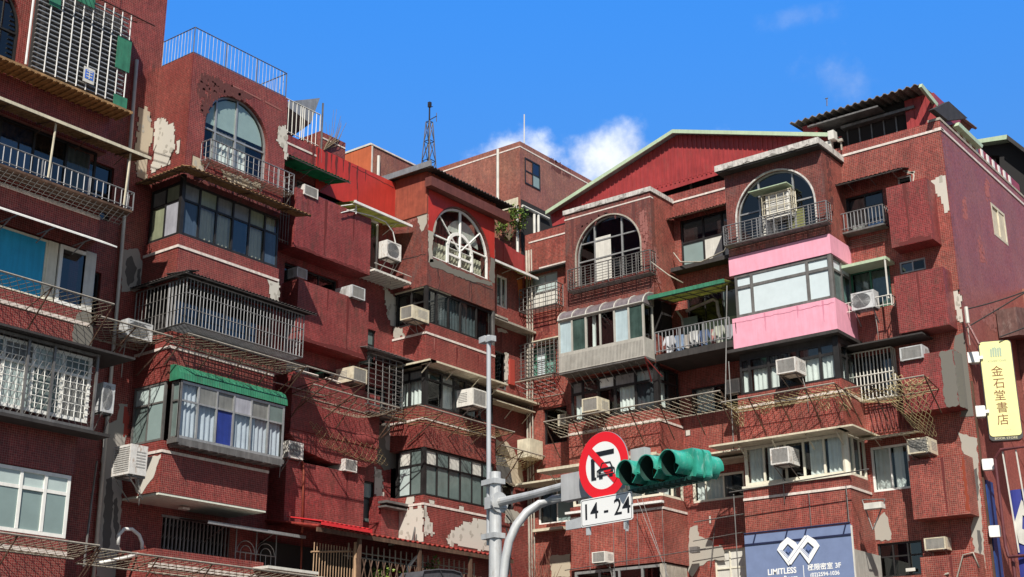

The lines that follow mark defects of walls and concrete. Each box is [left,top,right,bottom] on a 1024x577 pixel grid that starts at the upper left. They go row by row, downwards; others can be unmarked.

peeling [134,106,204,180]
peeling [275,125,289,160]
peeling [931,175,949,213]
peeling [121,248,142,292]
peeling [939,289,974,417]
peeling [388,495,489,552]